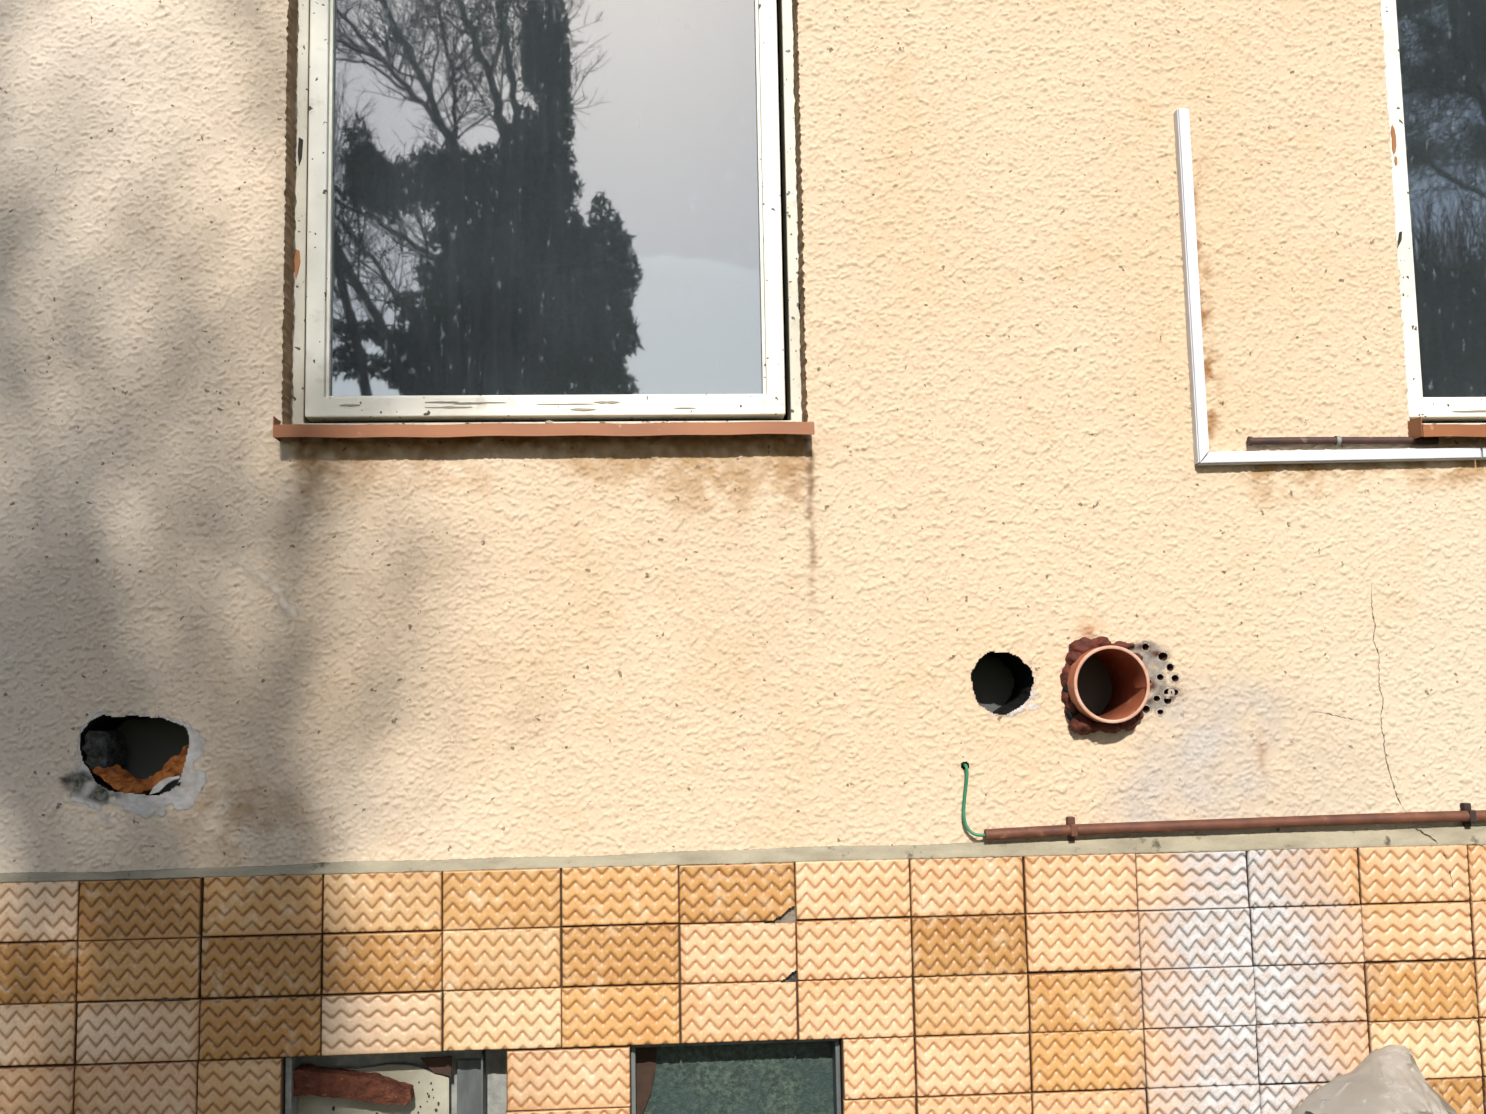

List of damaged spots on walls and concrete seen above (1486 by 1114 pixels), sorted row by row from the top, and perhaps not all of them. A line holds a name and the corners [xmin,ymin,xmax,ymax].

spalling [61,712,206,818]
crack [1309,587,1453,884]
leakage [1156,849,1339,1114]